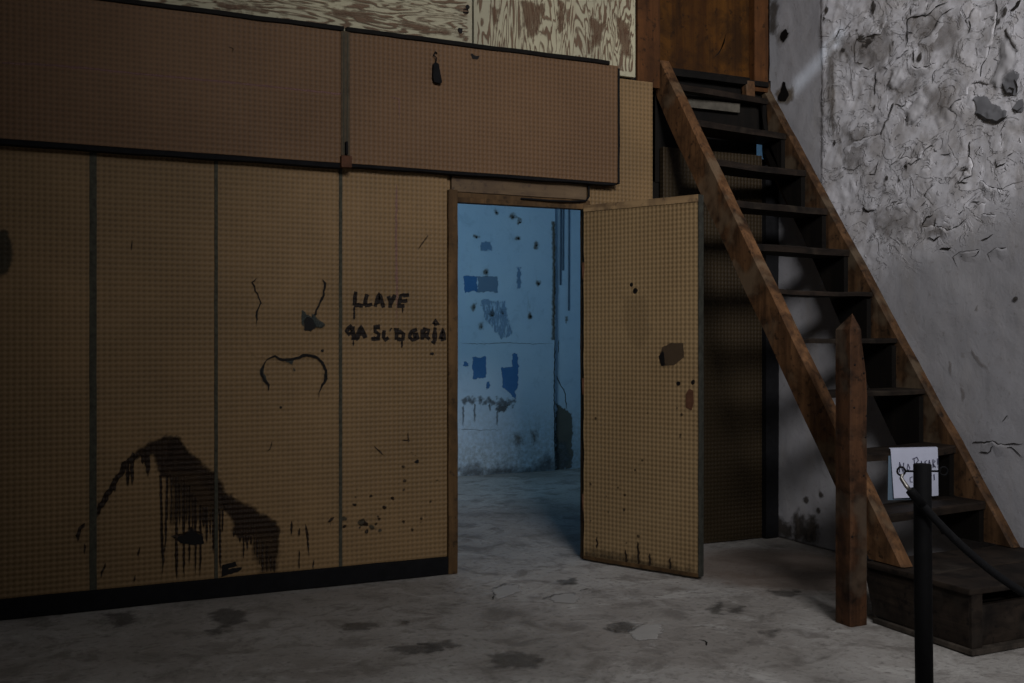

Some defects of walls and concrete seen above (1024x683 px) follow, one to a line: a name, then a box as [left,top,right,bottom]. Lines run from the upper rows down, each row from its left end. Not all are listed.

flaking render [958,70,1024,123]
crack [835,0,1024,267]
leakage [462,396,515,422]
crack [973,416,1020,457]
leakage [97,436,314,576]